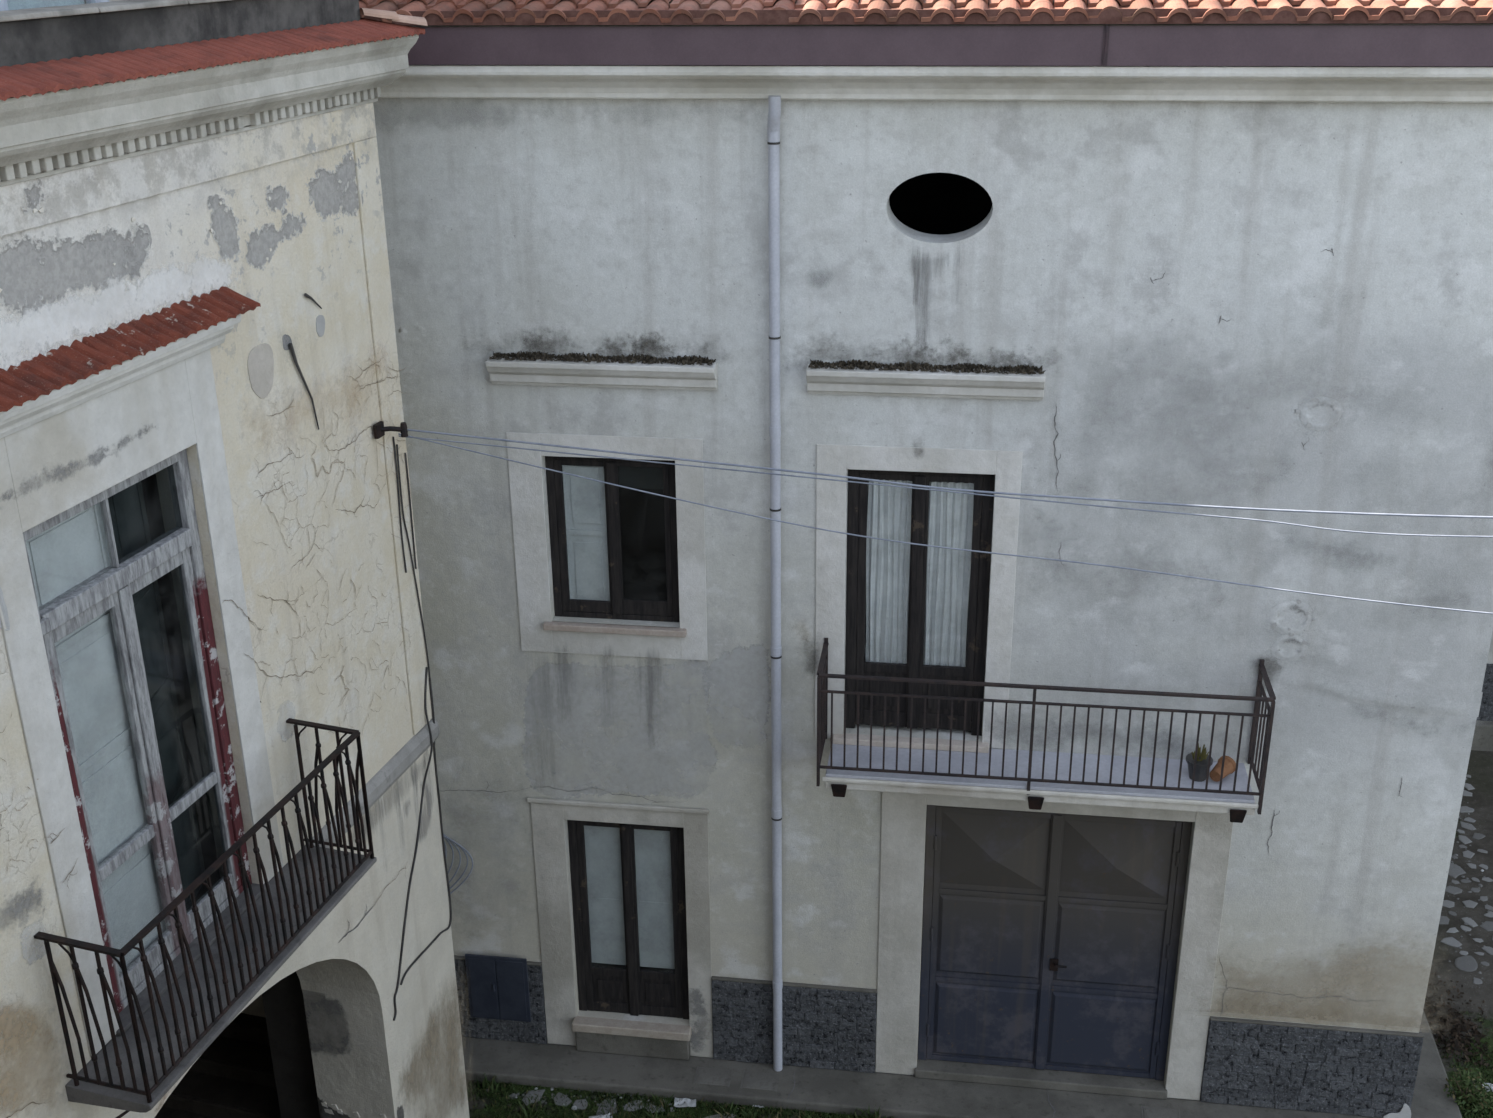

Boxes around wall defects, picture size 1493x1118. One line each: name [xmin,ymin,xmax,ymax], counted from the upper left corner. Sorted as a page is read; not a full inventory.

peeling [0,174,152,317]
peeling [207,150,364,271]
crack [224,357,416,733]
crack [0,713,78,888]